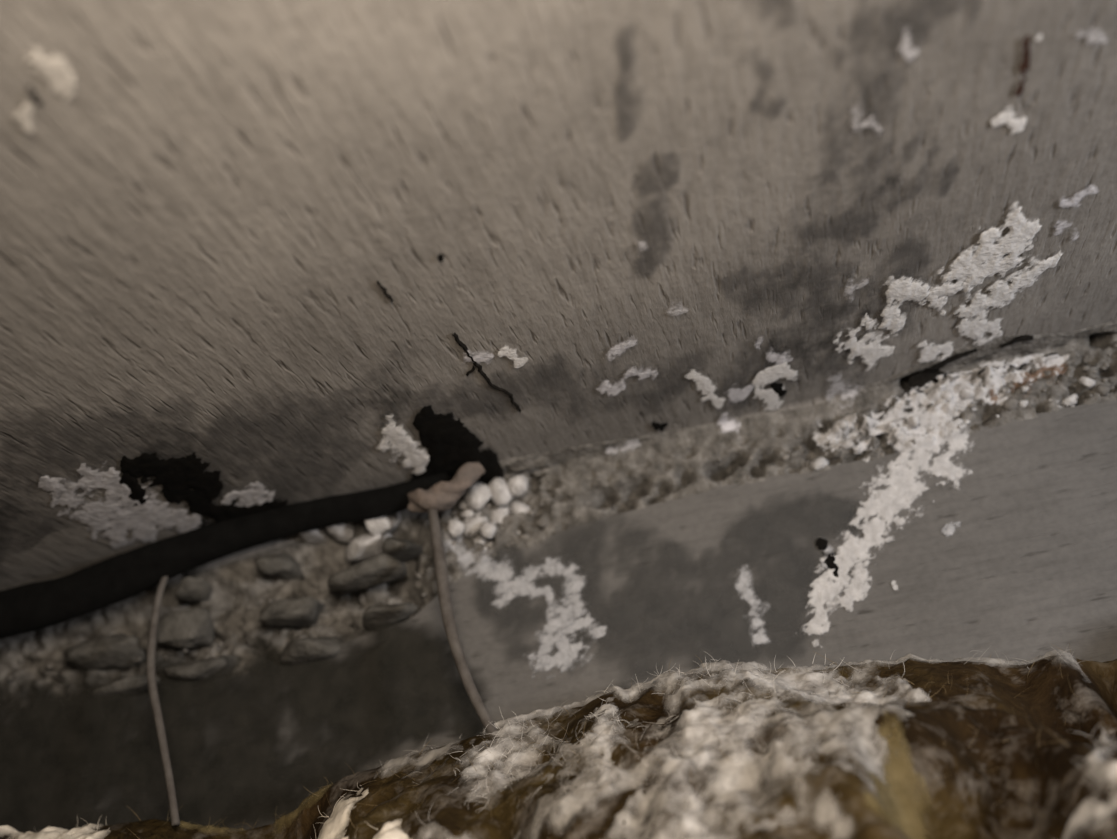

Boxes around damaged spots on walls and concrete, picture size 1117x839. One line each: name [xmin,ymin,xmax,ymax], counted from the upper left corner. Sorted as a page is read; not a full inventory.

leakage [898,32,919,62]
rust [1015,35,1031,96]
leakage [853,110,882,131]
leakage [991,106,1027,134]
leakage [1055,185,1098,240]
spalling [770,382,787,397]
peeling [377,405,504,485]
leakage [441,201,1069,678]
peeling [37,452,288,550]
spalling [815,538,839,577]
spalling [254,512,423,665]
spalling [63,563,243,697]